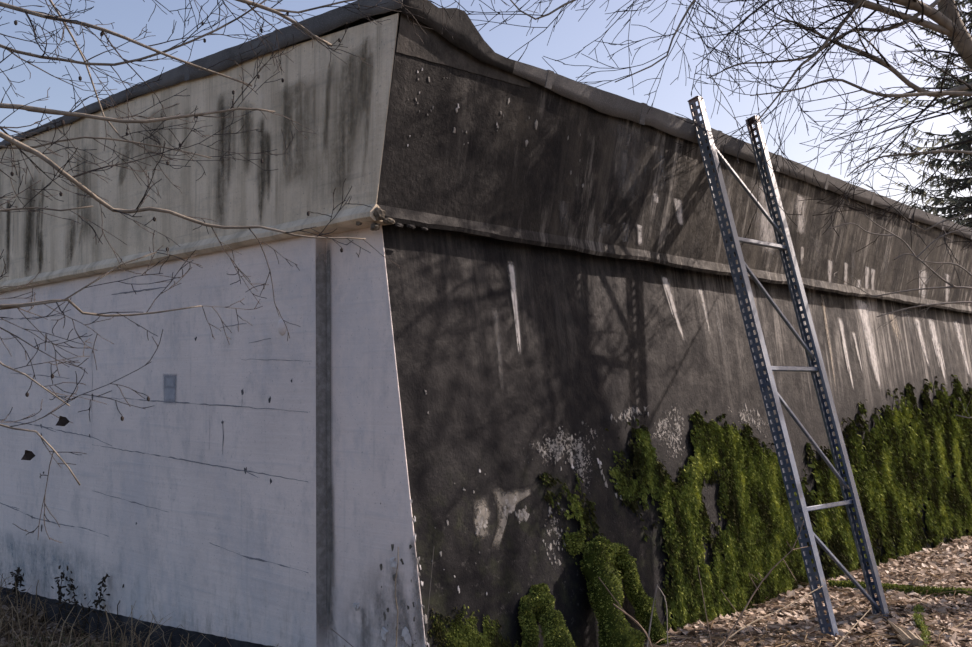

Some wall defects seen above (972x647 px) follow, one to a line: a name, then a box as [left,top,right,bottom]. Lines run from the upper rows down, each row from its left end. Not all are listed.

damp [759,186,774,250]
damp [797,196,805,233]
damp [509,264,520,349]
damp [662,277,683,337]
damp [844,263,875,290]
damp [839,300,880,386]
damp [889,314,945,379]
damp [954,322,969,373]
crack [4,374,308,482]
crack [1,503,107,536]
spalling [454,483,530,543]
peeling [381,601,429,647]